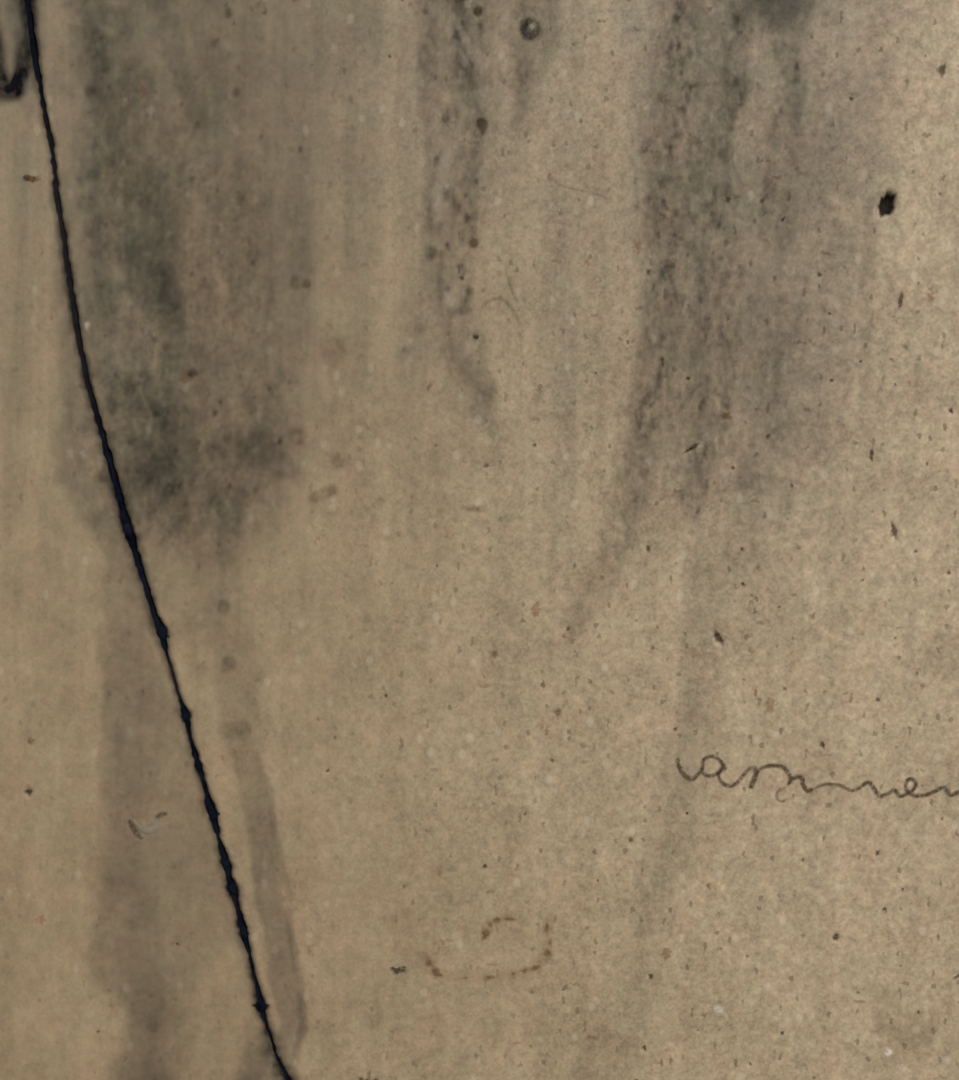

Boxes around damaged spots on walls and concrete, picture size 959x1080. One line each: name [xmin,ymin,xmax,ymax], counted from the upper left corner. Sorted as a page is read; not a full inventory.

crack [24,0,294,1080]